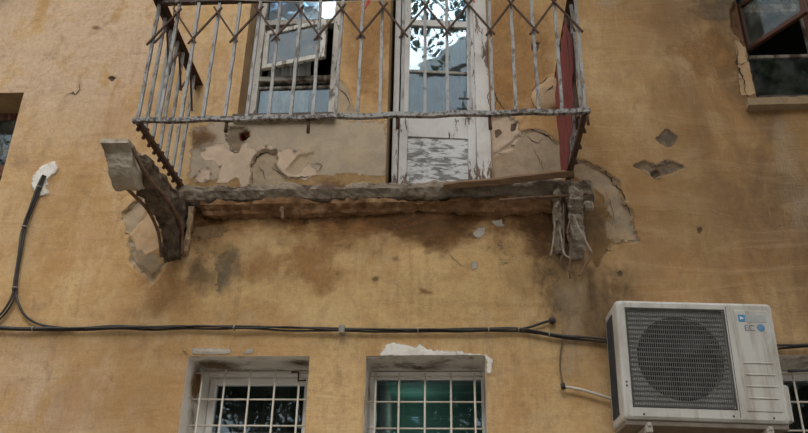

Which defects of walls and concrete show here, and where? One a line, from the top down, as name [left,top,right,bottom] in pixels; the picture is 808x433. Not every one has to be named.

water stain [487,0,550,106]
spalling [730,2,755,95]
spalling [121,190,166,284]
corrosion [184,207,244,239]
water stain [154,226,278,310]
peeling [189,119,387,187]
corrosion [276,210,483,246]
corrosion [495,212,553,255]
spalling [491,116,563,180]
water stain [533,213,576,310]
spalling [574,160,643,251]
spalling [633,159,683,180]